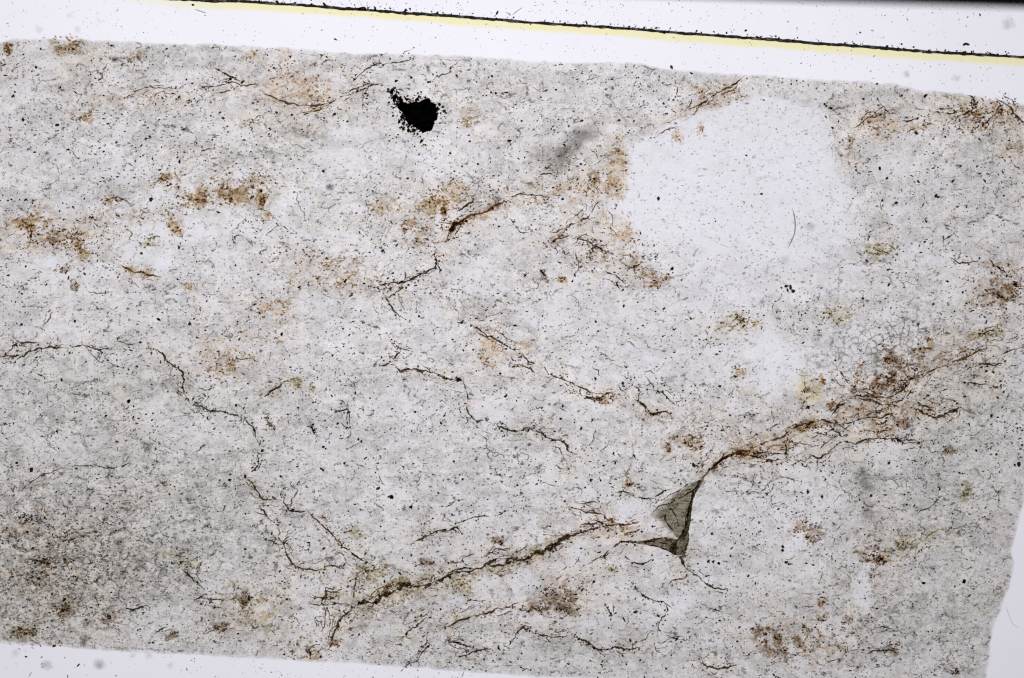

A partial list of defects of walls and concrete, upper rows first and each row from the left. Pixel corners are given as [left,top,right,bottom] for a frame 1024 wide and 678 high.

corrosion [544,138,635,201]
corrosion [5,167,280,291]
corrosion [538,215,674,296]
crack [0,341,116,362]
crack [368,165,628,473]
crack [457,320,686,419]
corrosion [662,258,1024,464]
crack [692,324,1024,495]
crack [20,455,133,491]
crack [150,348,736,675]
crack [123,603,172,634]
crack [867,624,901,656]